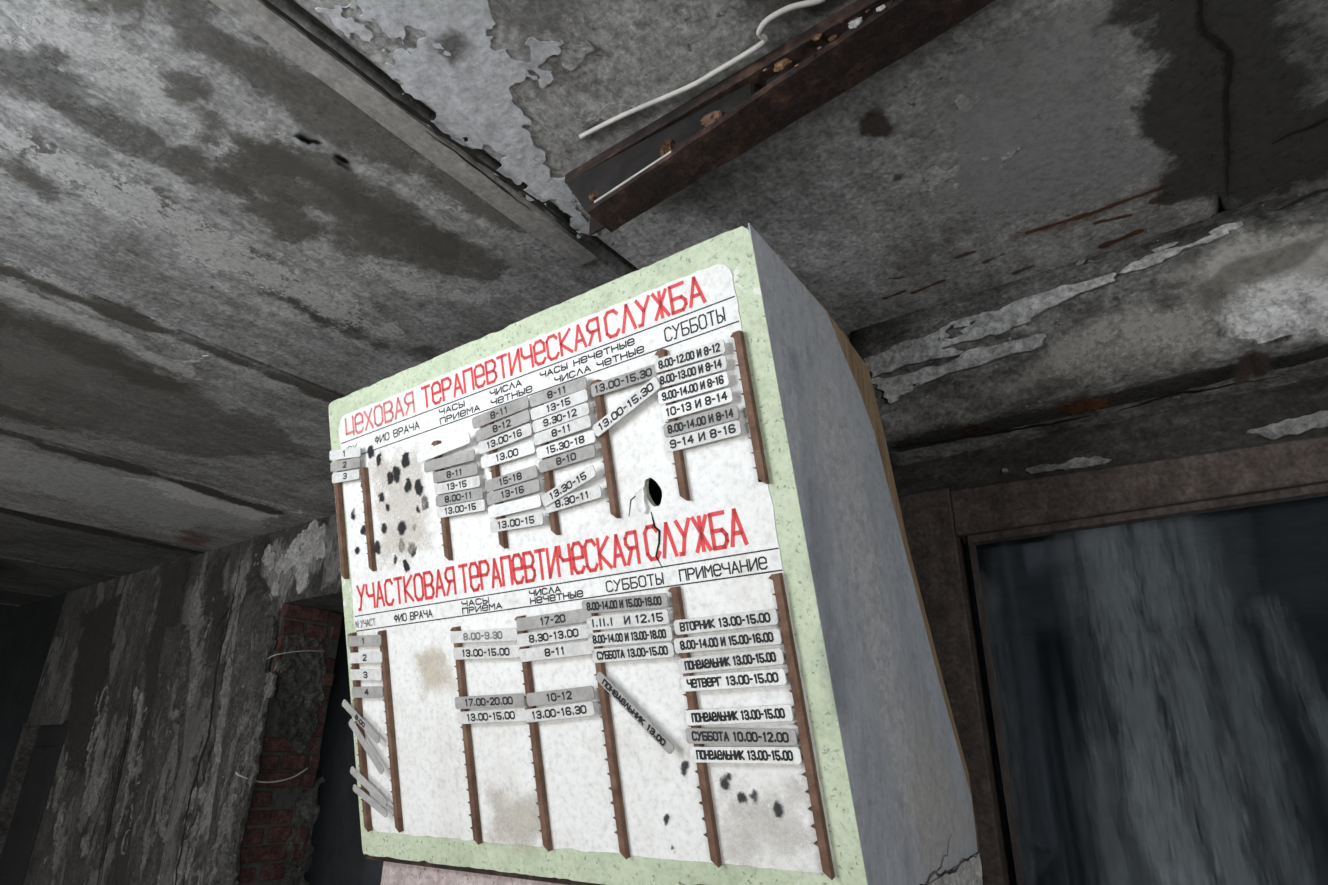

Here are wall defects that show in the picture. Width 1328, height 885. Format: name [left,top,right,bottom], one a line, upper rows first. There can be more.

damp [0,0,537,358]
peeling [315,0,598,238]
rust [858,109,893,137]
rust [882,276,946,300]
rust [1025,186,1167,248]
spalling [864,222,1328,404]
damp [923,0,1328,227]
crack [1197,0,1234,197]
peeling [1247,411,1328,441]
damp [0,257,343,885]
peeling [44,686,148,885]
spalling [158,519,327,885]